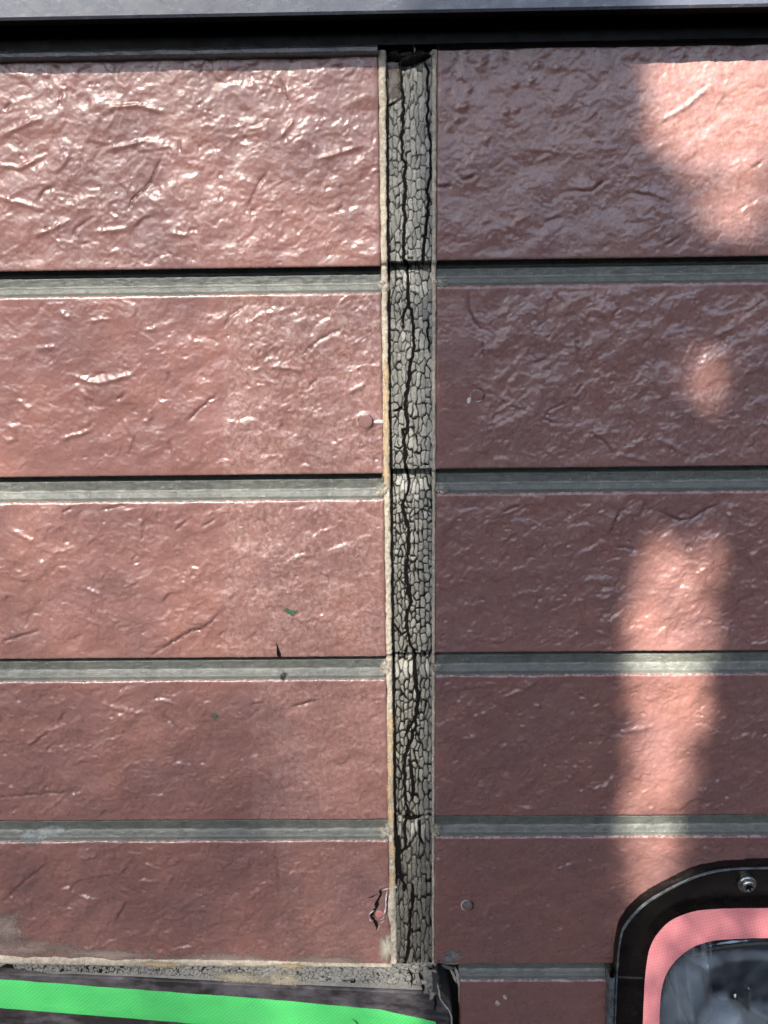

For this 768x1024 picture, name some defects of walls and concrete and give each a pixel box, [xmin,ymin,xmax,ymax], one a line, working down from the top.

crack [2,62,472,1010]
peeling [369,886,397,962]